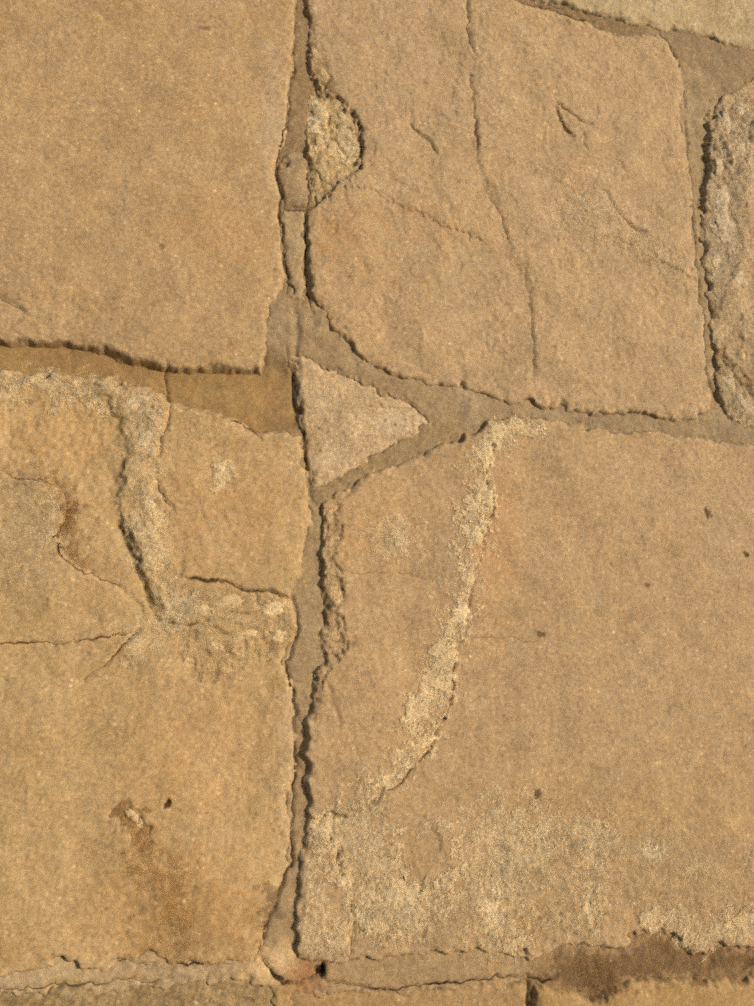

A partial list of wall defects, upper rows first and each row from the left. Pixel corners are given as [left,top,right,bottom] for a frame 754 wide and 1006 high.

crack [465,0,475,54]
spalling [304,41,367,205]
crack [469,79,479,148]
crack [190,576,284,597]
crack [0,633,135,661]
crack [259,617,552,1006]
water stain [638,906,697,949]
water stain [715,903,754,939]
crack [118,959,205,983]